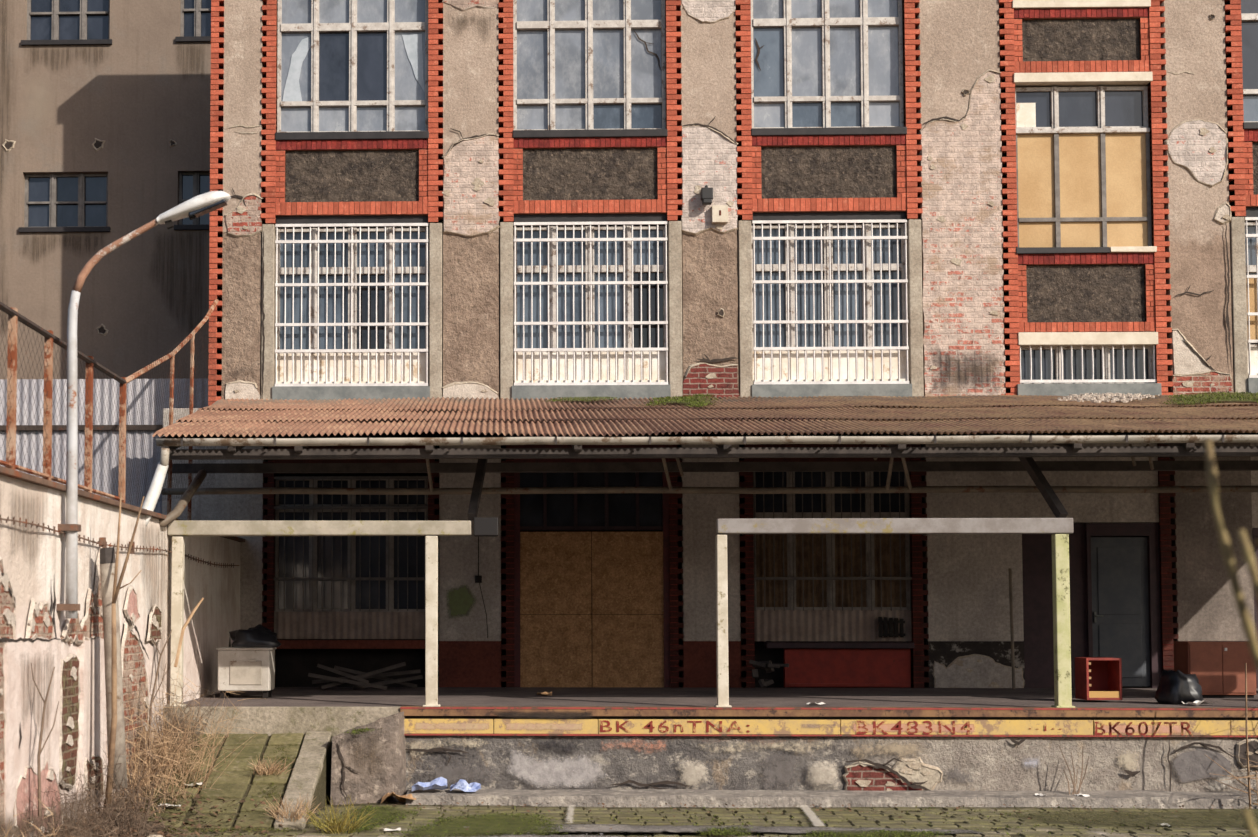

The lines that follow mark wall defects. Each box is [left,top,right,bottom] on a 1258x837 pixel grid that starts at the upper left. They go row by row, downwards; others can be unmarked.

crack [922,115,967,125]
spalling [225,193,263,238]
spalling [442,133,500,238]
spalling [681,125,739,236]
spalling [920,69,1006,396]
spalling [683,362,739,398]
damp [934,356,989,387]
spalling [1172,329,1234,395]
spalling [0,546,105,837]
spalling [121,585,162,777]
peeling [932,654,1025,688]
spalling [842,724,974,791]